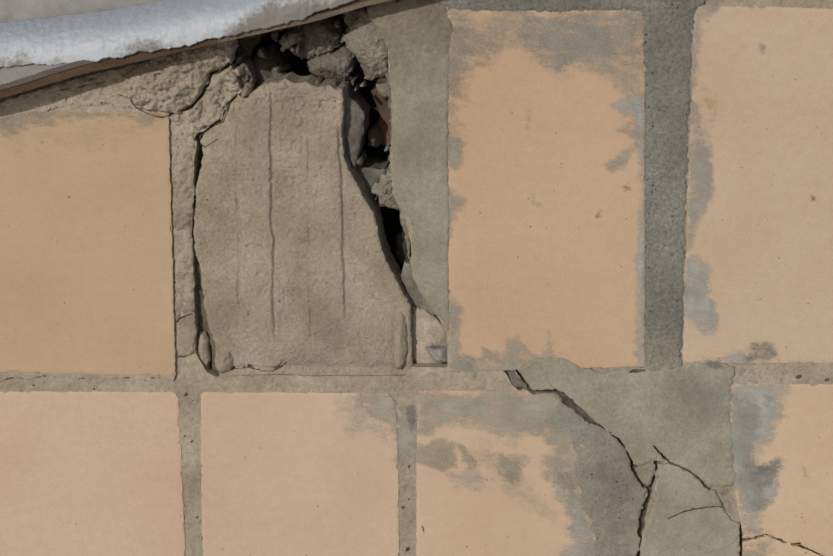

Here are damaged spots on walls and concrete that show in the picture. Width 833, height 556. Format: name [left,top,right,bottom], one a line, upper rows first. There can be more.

spalling [334,6,368,45]
spalling [170,26,447,381]
water stain [636,224,645,365]
crack [518,371,599,424]
water stain [360,391,595,556]
crack [618,438,722,556]
crack [739,524,823,556]